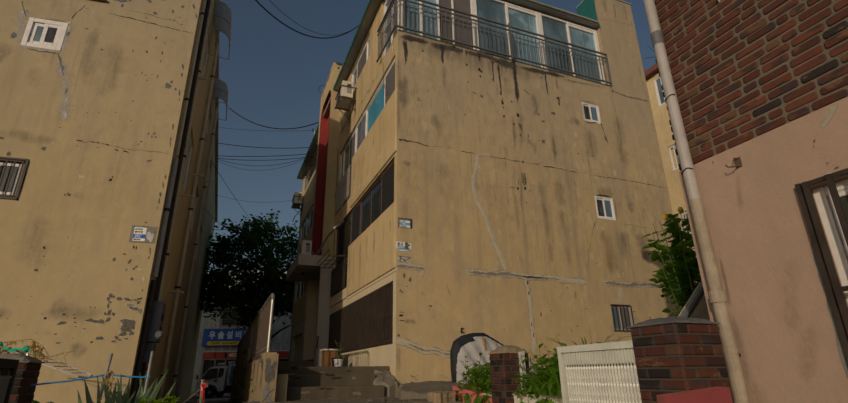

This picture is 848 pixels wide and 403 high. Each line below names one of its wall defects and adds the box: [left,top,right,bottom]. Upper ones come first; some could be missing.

crack [110,11,189,33]
damp [403,35,564,101]
crack [77,136,168,154]
crack [396,60,668,354]
peeling [54,246,145,344]
crack [396,338,450,358]